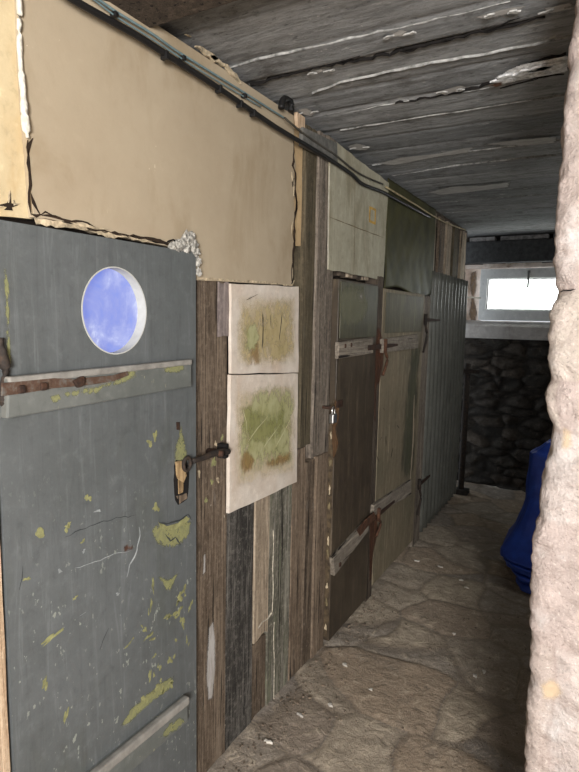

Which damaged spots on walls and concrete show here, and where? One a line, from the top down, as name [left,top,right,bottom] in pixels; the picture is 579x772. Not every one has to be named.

peeling [384,30,416,40]
spalling [490,56,568,85]
crack [26,138,95,227]
crack [290,140,298,281]
peeling [152,514,191,547]
peeling [148,574,193,646]
peeling [123,653,175,725]